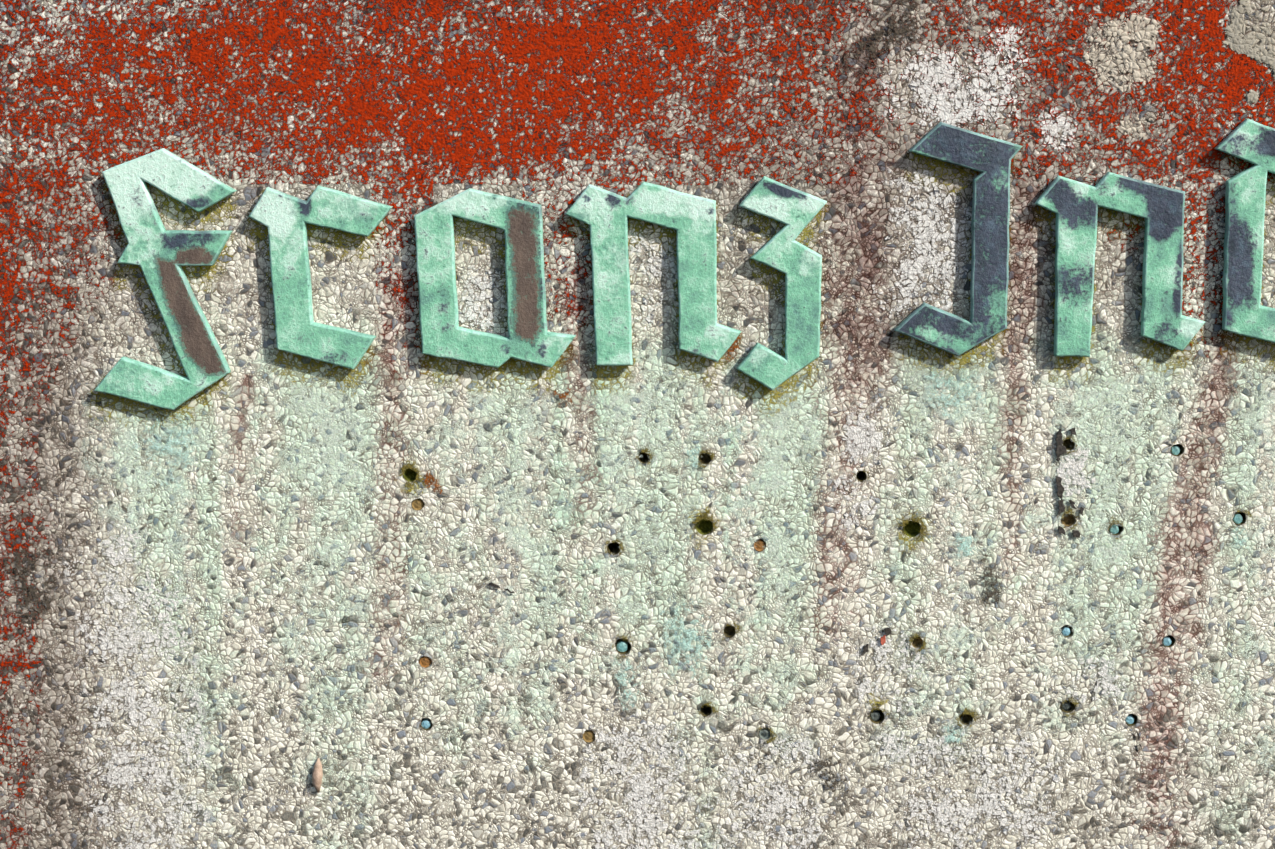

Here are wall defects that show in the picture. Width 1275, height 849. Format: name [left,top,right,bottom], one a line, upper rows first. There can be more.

damp [1028,205,1204,726]
damp [1213,325,1275,513]